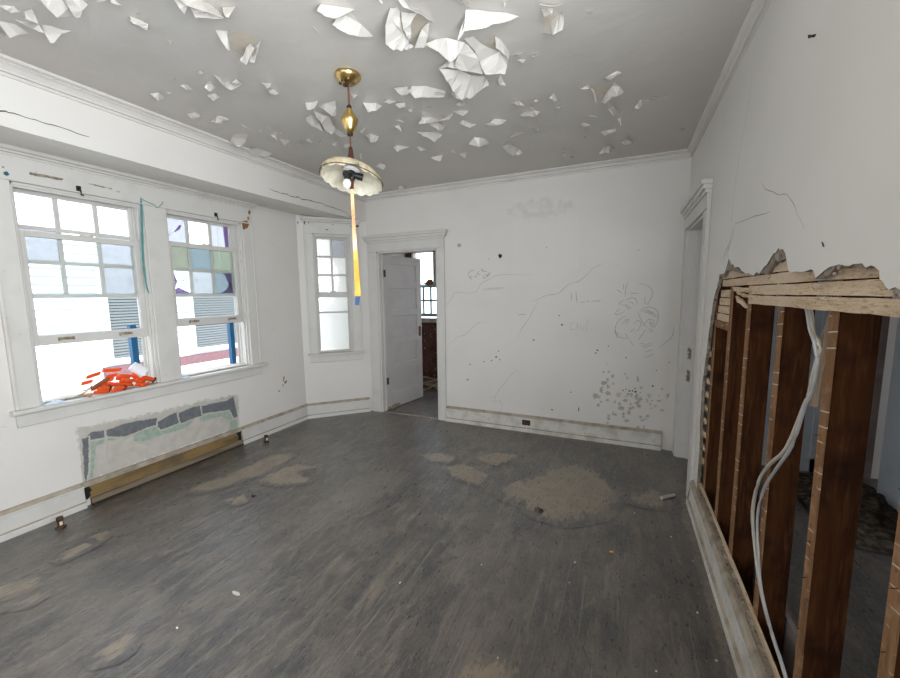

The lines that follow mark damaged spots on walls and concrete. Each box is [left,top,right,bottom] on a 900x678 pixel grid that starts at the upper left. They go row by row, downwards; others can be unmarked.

peeling [0,0,122,43]
peeling [174,0,264,65]
peeling [317,4,373,37]
peeling [538,3,564,35]
peeling [198,70,243,101]
peeling [351,0,540,161]
crack [0,110,88,141]
peeling [231,101,350,157]
peeling [581,71,634,154]
crack [724,184,803,256]
flaking render [761,249,786,275]
flaking render [814,263,866,279]